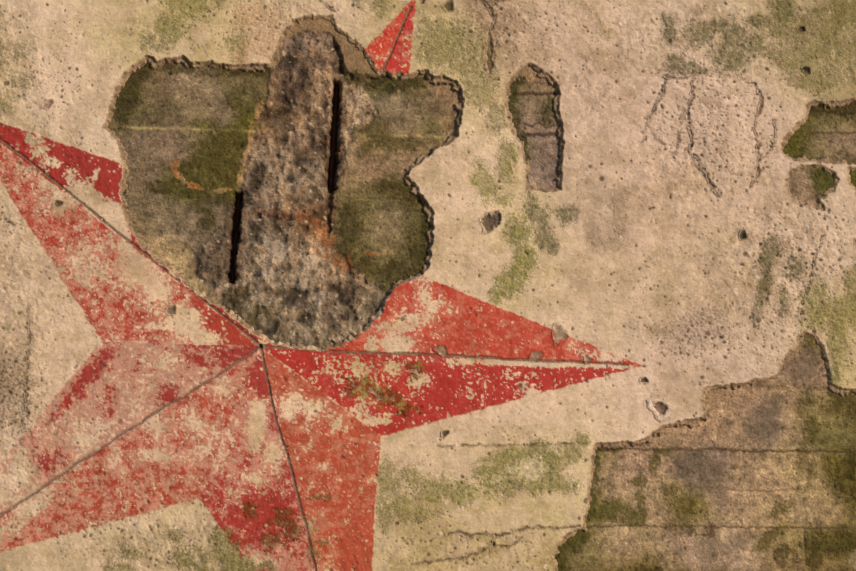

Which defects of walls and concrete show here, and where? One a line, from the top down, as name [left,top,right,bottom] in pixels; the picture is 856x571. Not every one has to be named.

rust [168,82,394,293]
spalling [101,13,465,352]
spalling [504,62,565,193]
crack [642,73,721,197]
crack [747,81,779,188]
spalling [780,96,856,211]
flaking render [552,323,569,345]
spalling [552,330,856,571]
crack [411,524,582,565]